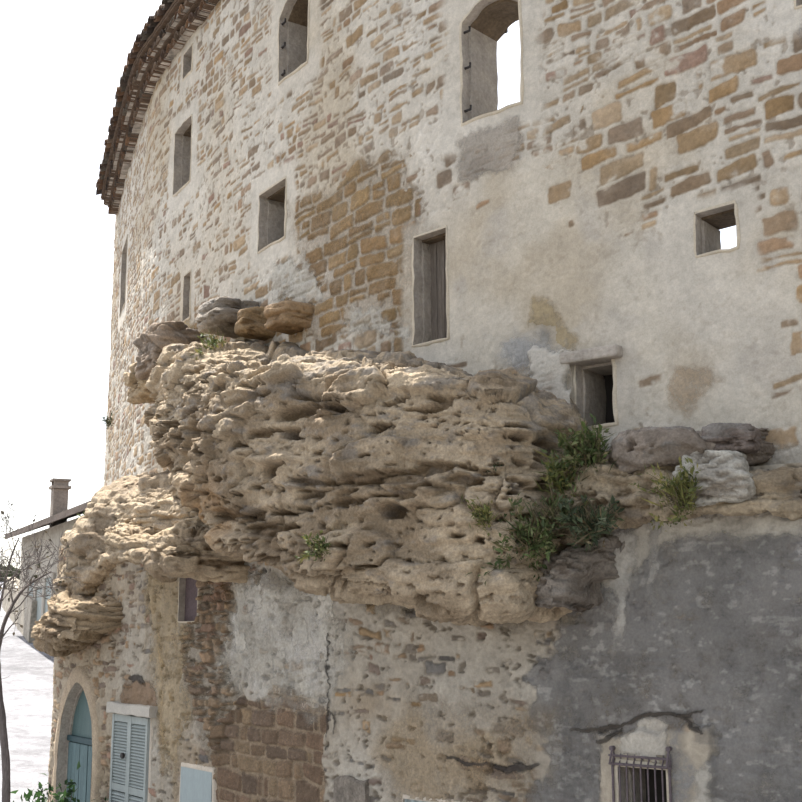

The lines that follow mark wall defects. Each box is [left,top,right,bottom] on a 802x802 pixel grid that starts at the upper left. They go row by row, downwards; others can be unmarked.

flaking render [182,571,346,802]
crack [325,633,336,750]
leakage [385,514,802,802]
crack [570,710,703,744]